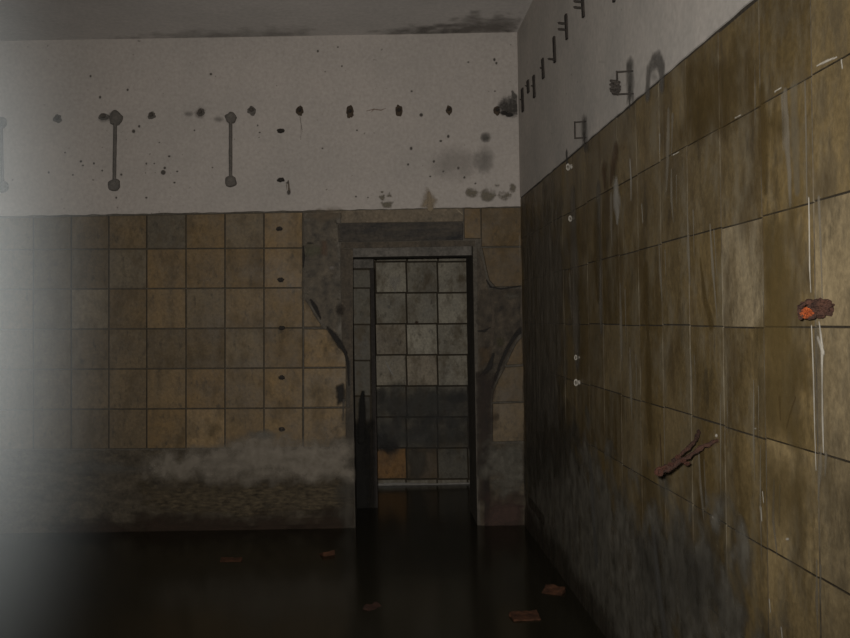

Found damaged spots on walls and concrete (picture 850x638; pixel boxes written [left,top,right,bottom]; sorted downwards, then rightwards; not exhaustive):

water stain [453,19,510,33]
crack [310,299,350,386]
crack [482,327,522,387]
corrosion [798,307,815,320]